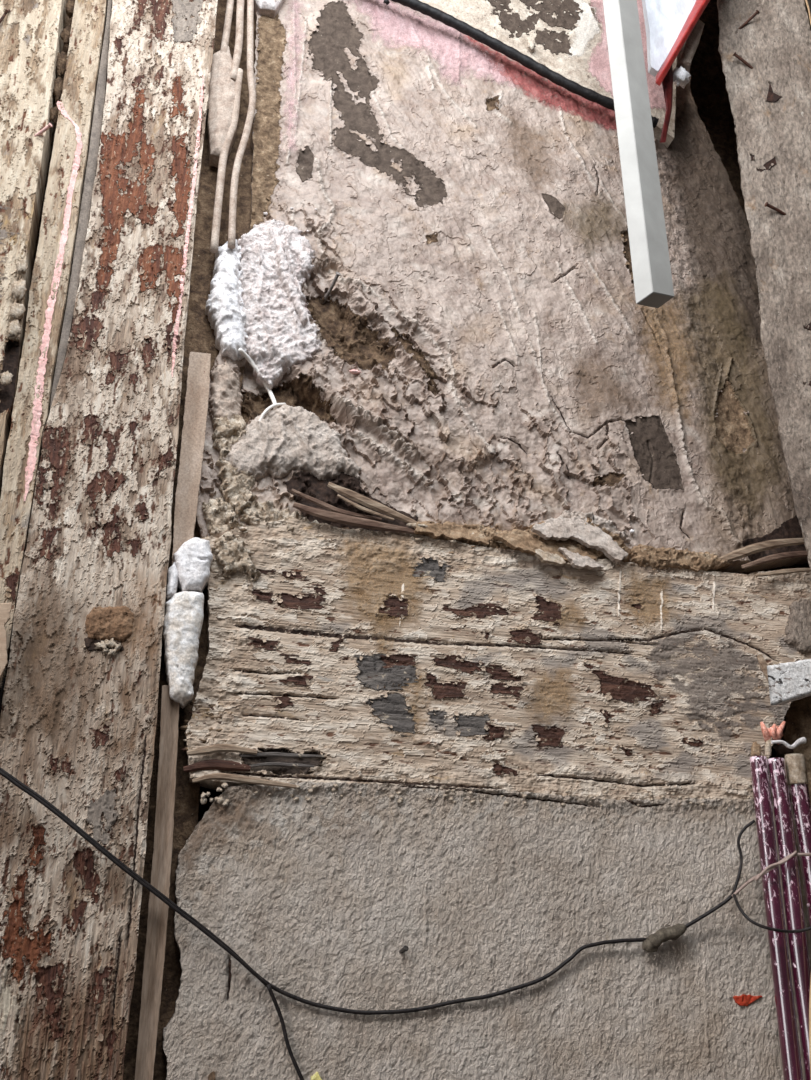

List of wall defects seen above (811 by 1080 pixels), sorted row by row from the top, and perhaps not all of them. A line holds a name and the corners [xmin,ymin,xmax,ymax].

water stain [368,2,506,82]
peeling [72,66,194,385]
spalling [0,340,20,413]
peeling [36,415,140,560]
flaking render [625,413,684,490]
flaking render [202,471,733,612]
crack [233,624,777,661]
peeling [510,593,563,645]
crack [235,670,337,721]
peeling [354,653,524,740]
peeling [583,660,665,727]
peeling [0,769,127,1039]